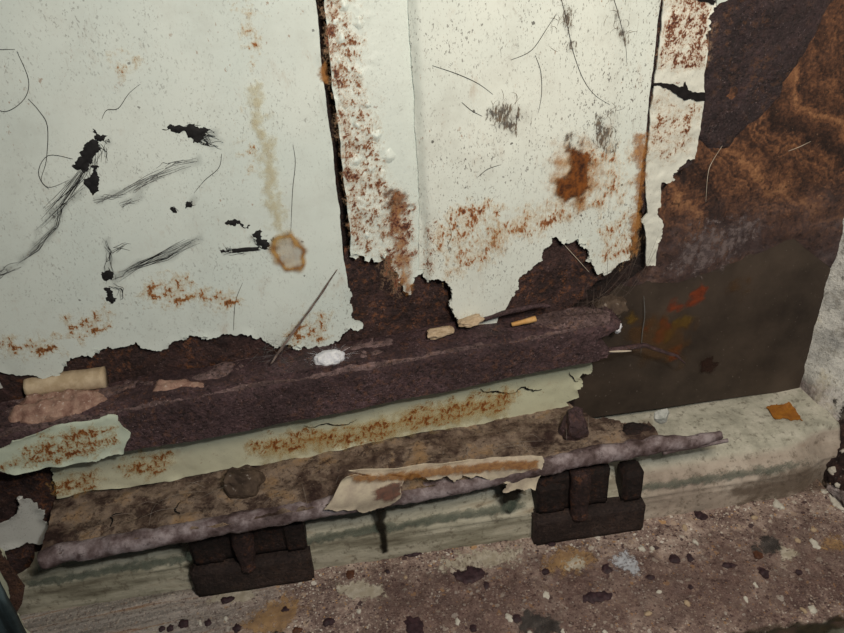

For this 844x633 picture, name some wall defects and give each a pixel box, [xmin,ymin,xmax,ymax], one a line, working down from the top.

crack [652,82,705,101]
corrosion [320,0,844,292]
corrosion [147,276,240,308]
peeling [330,245,458,345]
peeling [498,237,608,318]
damp [663,209,773,305]
peeling [0,372,37,402]
peeling [62,334,306,383]
corrosion [246,386,519,454]